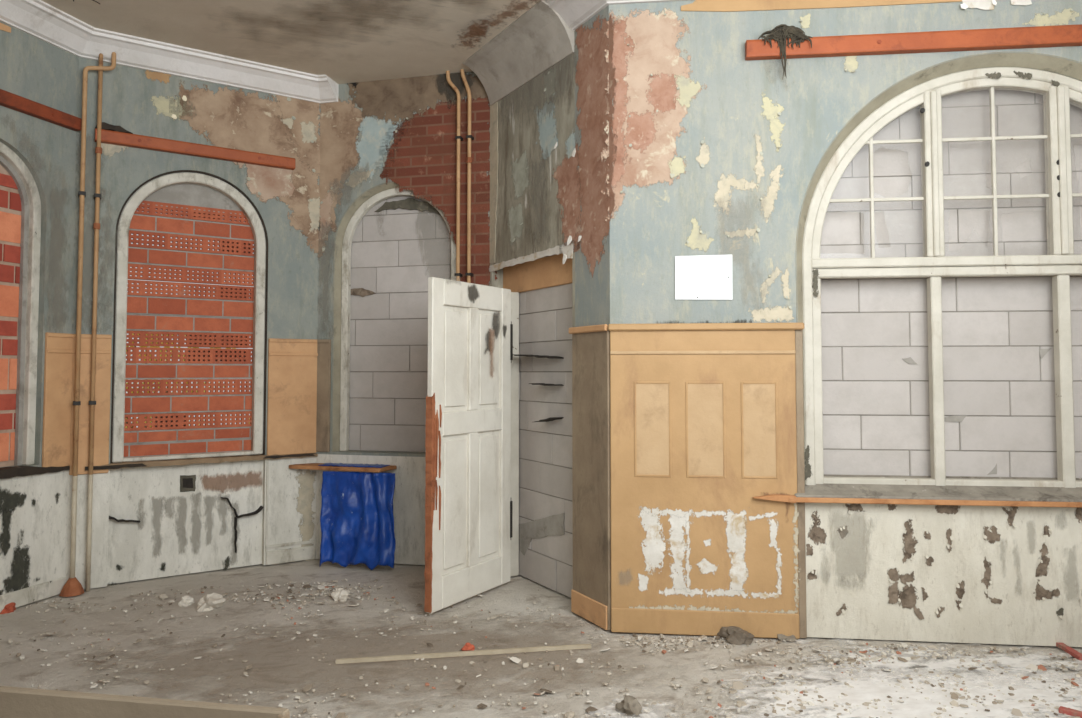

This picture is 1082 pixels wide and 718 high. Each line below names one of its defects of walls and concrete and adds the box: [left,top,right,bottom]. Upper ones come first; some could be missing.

flaking render [960,0,997,10]
peeling [1010,0,1080,26]
peeling [985,70,1033,80]
flaking render [145,8,710,286]
peeling [748,267,794,323]
peeling [811,269,820,297]
flaking render [806,504,867,556]
flaking render [935,505,960,515]
flaking render [983,506,1019,544]
flaking render [887,519,965,620]
flaking render [981,558,1002,604]
flaking render [1033,525,1064,619]